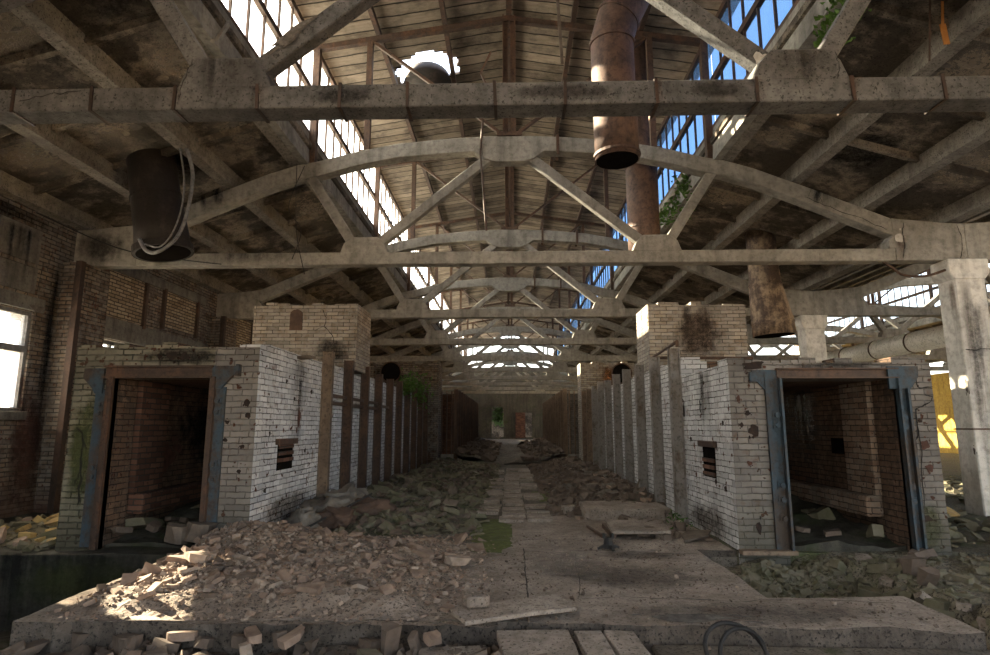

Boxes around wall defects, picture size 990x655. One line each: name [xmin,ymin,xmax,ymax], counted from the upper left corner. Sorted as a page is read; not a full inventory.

spalling [736,395,759,439]
crack [915,369,933,516]